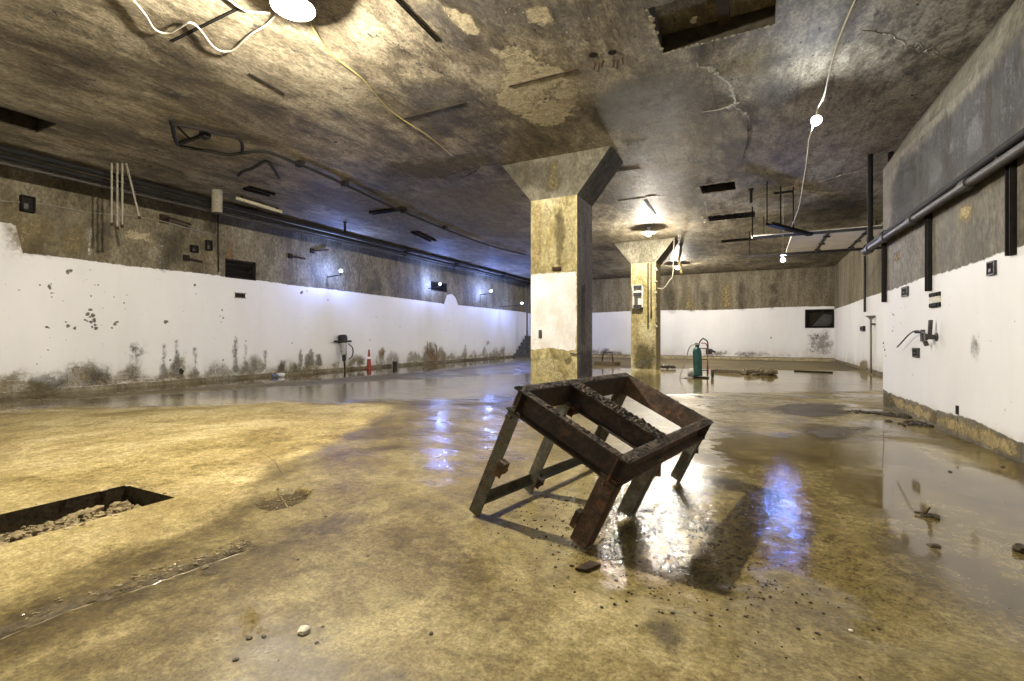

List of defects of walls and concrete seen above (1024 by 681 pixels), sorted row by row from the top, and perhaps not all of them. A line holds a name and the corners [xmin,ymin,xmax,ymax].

peeling [445,7,481,36]
peeling [505,6,554,25]
crack [862,30,957,63]
peeling [490,45,580,127]
crack [696,62,750,160]
water stain [810,333,830,354]
water stain [0,340,504,394]